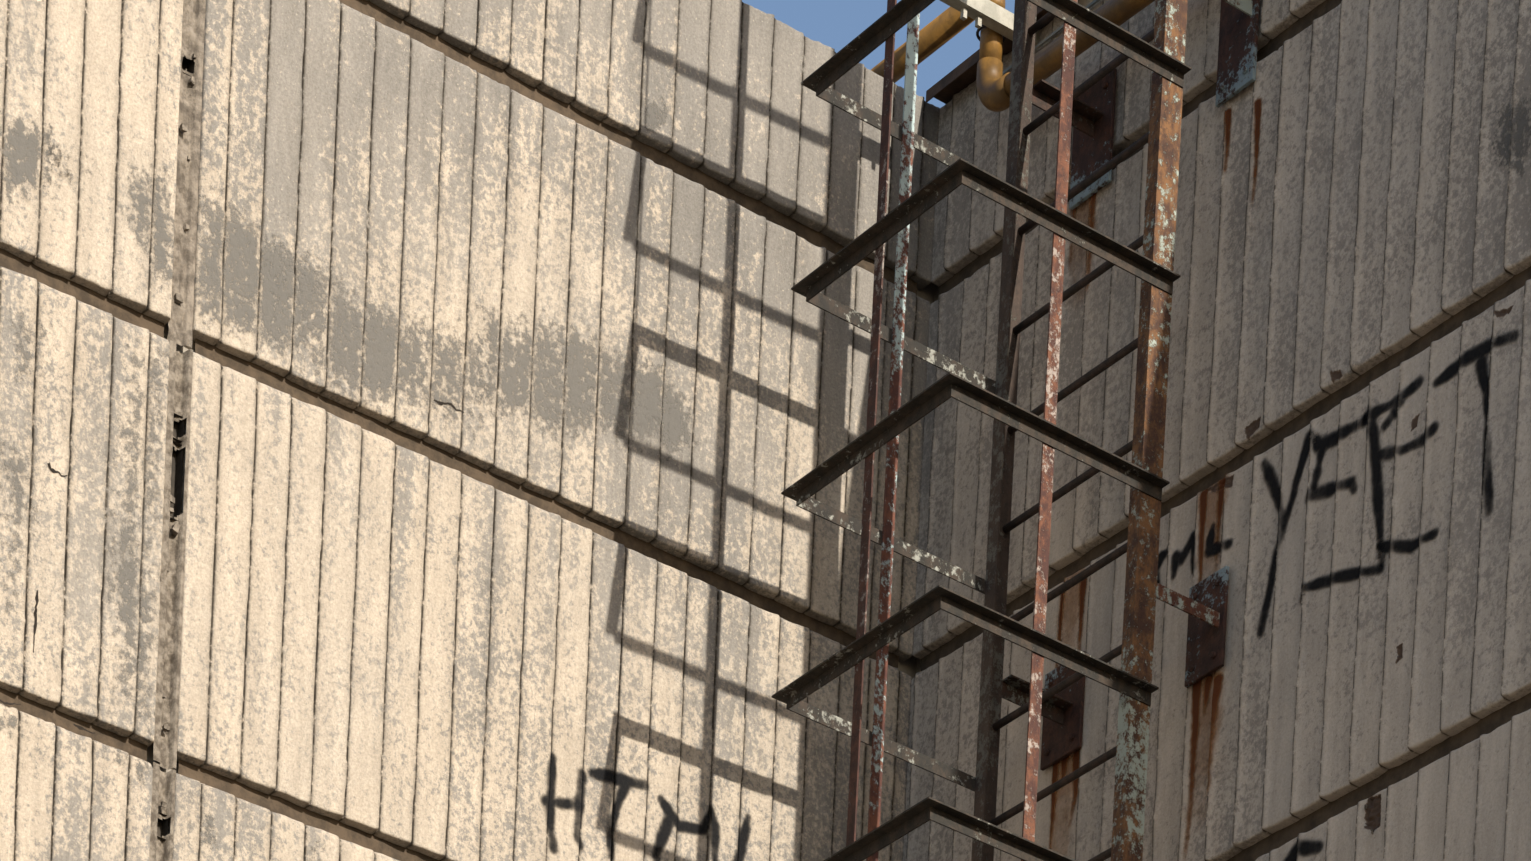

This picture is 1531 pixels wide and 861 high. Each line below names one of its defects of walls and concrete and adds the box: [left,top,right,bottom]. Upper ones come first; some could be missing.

water stain [127,166,175,288]
water stain [194,186,698,461]
corrosion [1198,477,1226,582]
corrosion [1058,578,1087,650]
corrosion [1049,750,1080,849]
corrosion [1185,673,1223,849]